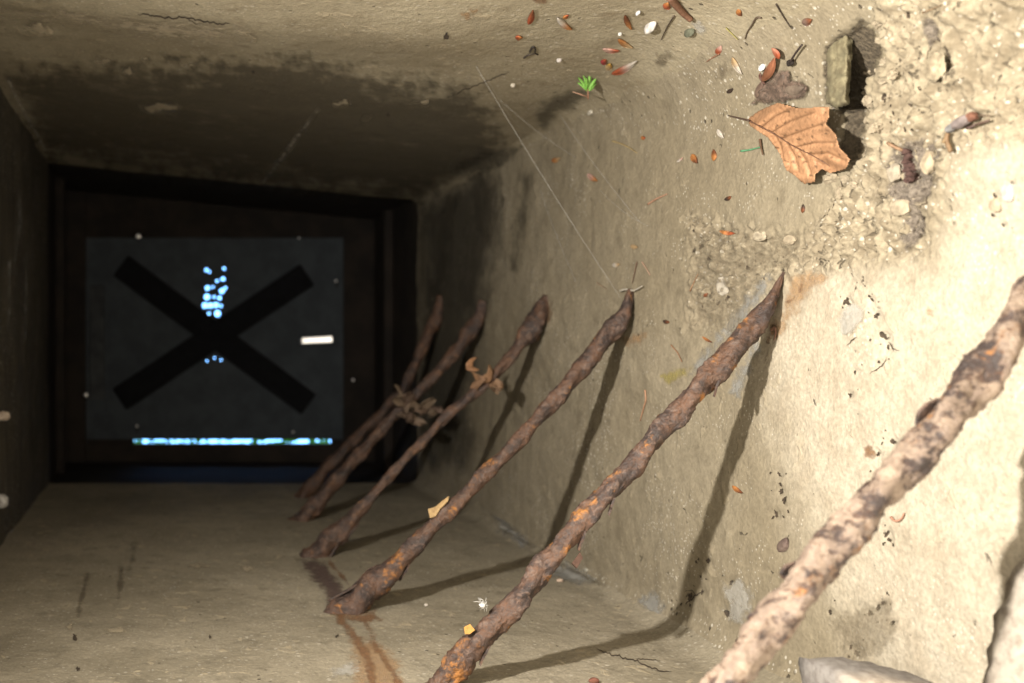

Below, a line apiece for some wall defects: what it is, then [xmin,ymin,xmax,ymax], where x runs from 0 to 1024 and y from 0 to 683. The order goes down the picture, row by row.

crack [139,13,230,25]
spalling [823,12,946,250]
spalling [989,181,1015,229]
water stain [8,56,498,465]
rust [915,398,939,425]
rust [779,559,798,580]
rust [303,561,402,683]